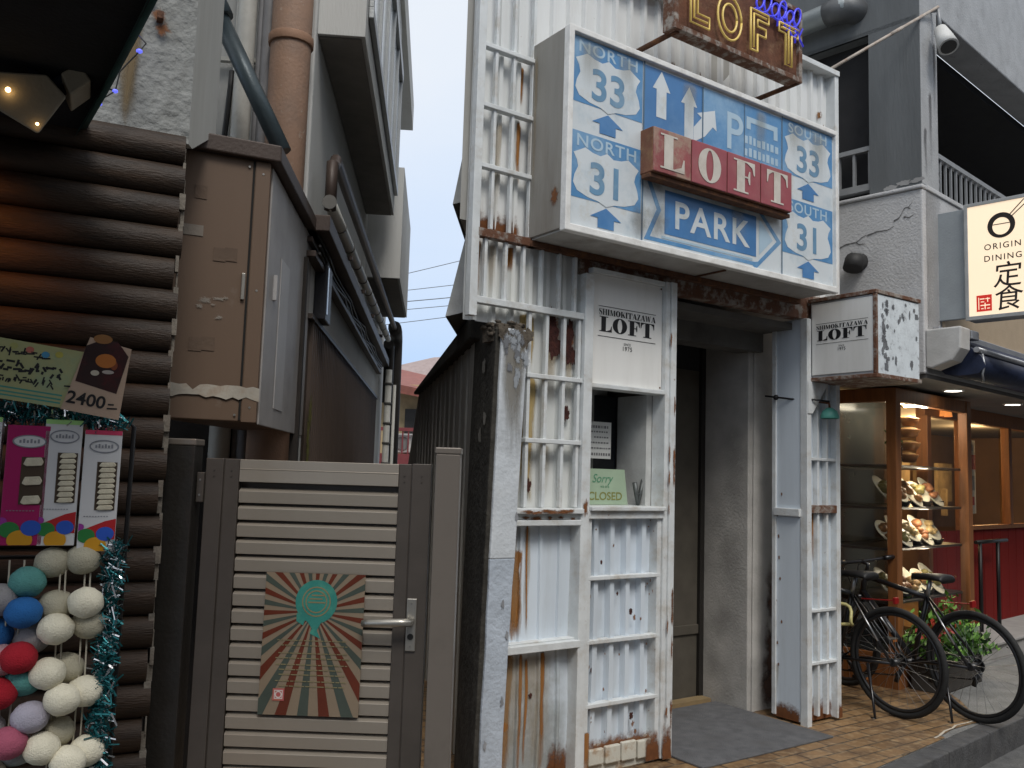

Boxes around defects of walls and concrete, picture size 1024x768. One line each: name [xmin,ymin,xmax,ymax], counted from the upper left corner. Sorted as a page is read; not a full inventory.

crack [839,204,913,249]
peeling [480,320,534,389]
rust [511,500,588,631]
rust [502,652,566,768]
rust [584,702,672,768]